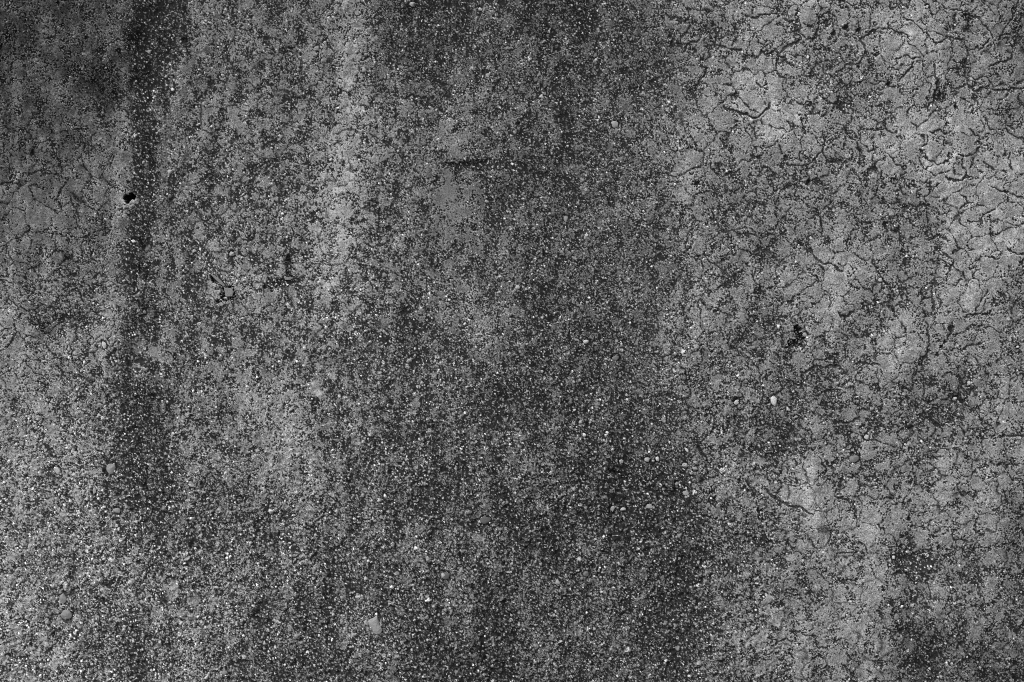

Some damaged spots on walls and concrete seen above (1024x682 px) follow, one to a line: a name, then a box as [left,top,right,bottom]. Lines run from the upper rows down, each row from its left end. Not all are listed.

crack [665,0,1024,371]
crack [801,362,882,427]
crack [948,468,1011,504]
crack [766,488,814,549]
crack [835,496,885,554]
crack [774,631,828,649]